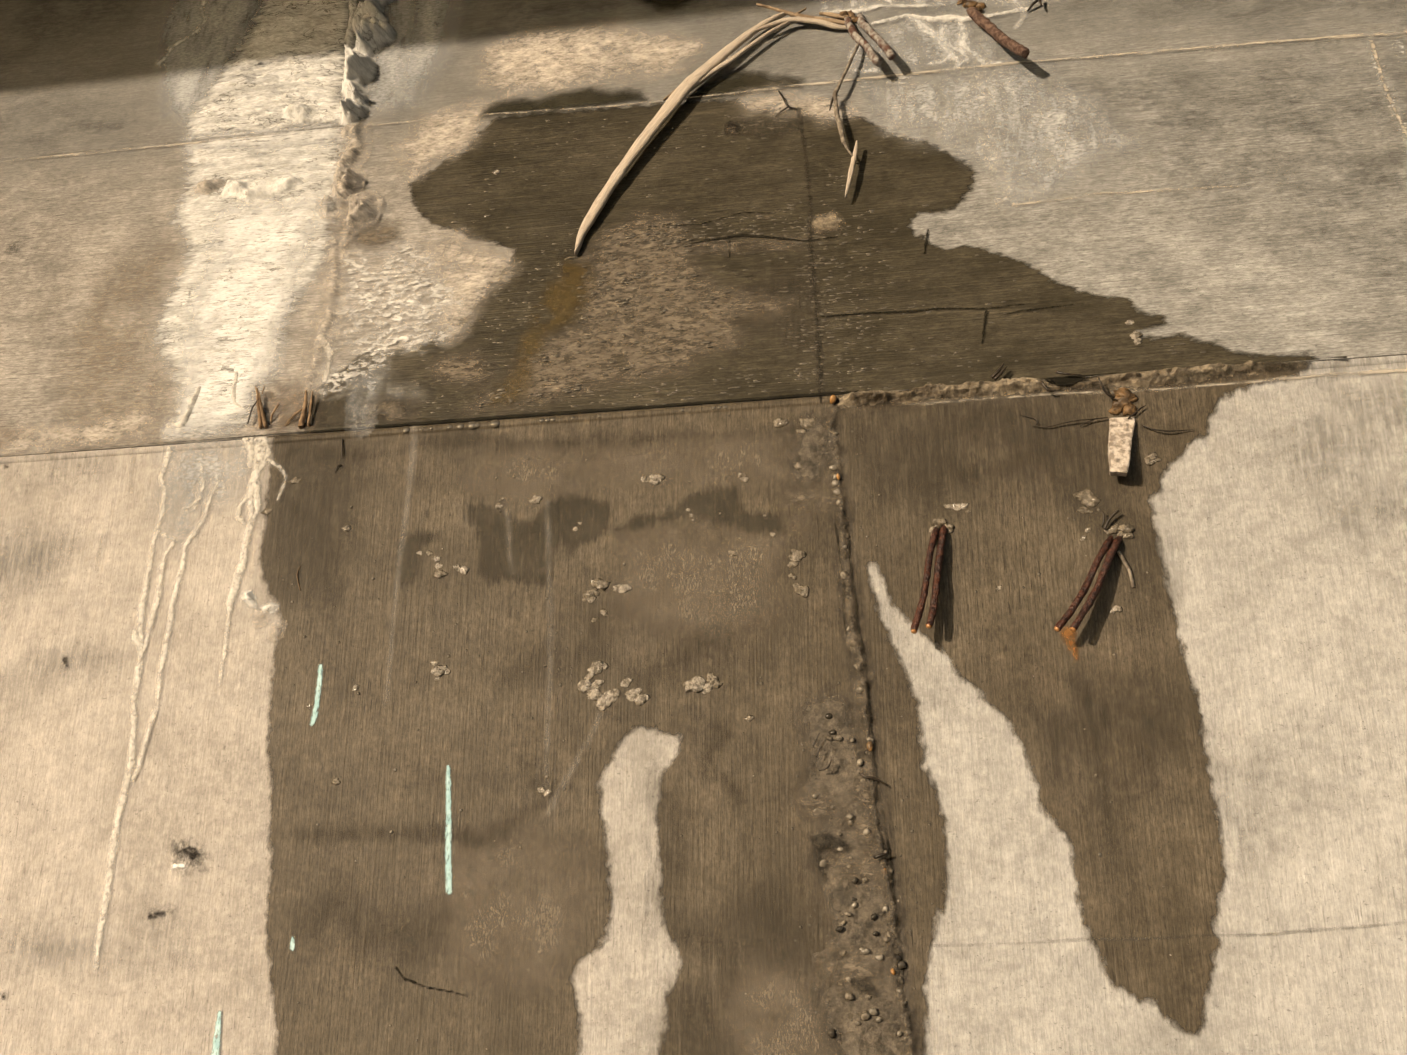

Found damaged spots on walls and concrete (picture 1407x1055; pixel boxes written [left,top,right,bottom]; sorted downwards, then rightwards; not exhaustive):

damp [154,0,448,439]
crack [674,212,833,257]
crack [922,229,930,254]
crack [821,304,1073,344]
damp [260,0,1318,1055]